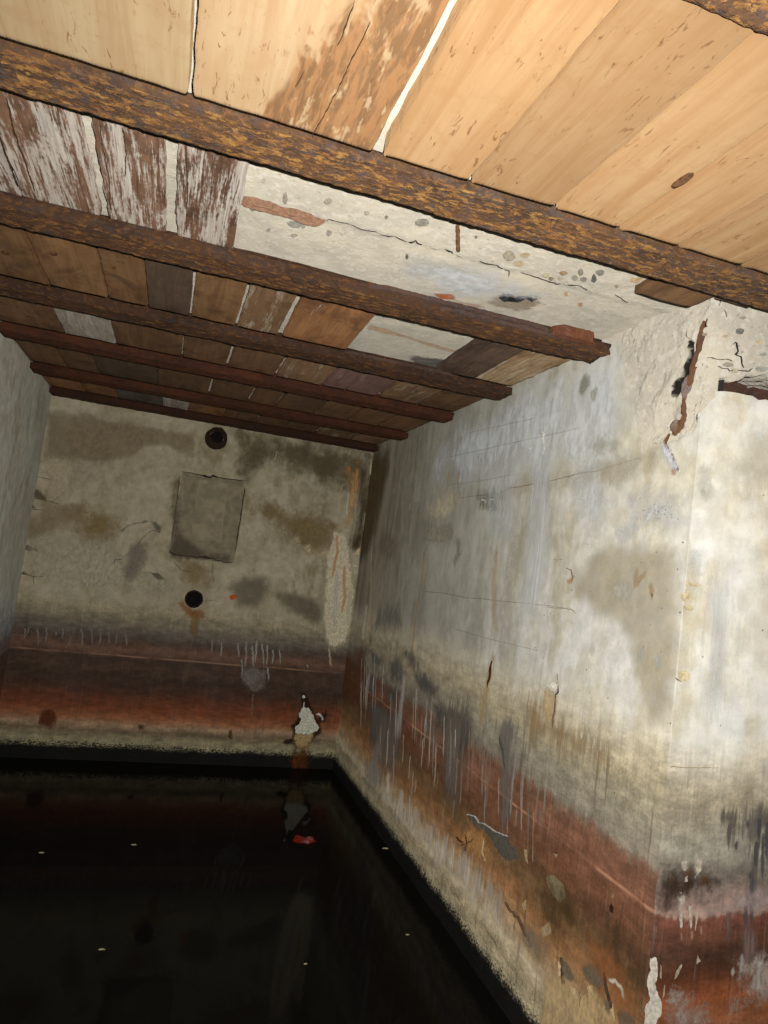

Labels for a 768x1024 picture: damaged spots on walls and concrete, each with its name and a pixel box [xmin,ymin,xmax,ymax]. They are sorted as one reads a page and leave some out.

crack [328,219,587,290]
spalling [491,293,539,311]
spalling [604,297,760,446]
rust [664,321,706,471]
crack [707,342,753,372]
leakage [49,415,193,459]
leakage [235,435,396,665]
leakage [237,641,281,691]
peeling [462,814,528,863]
peeling [545,875,566,903]
leakage [721,806,768,998]